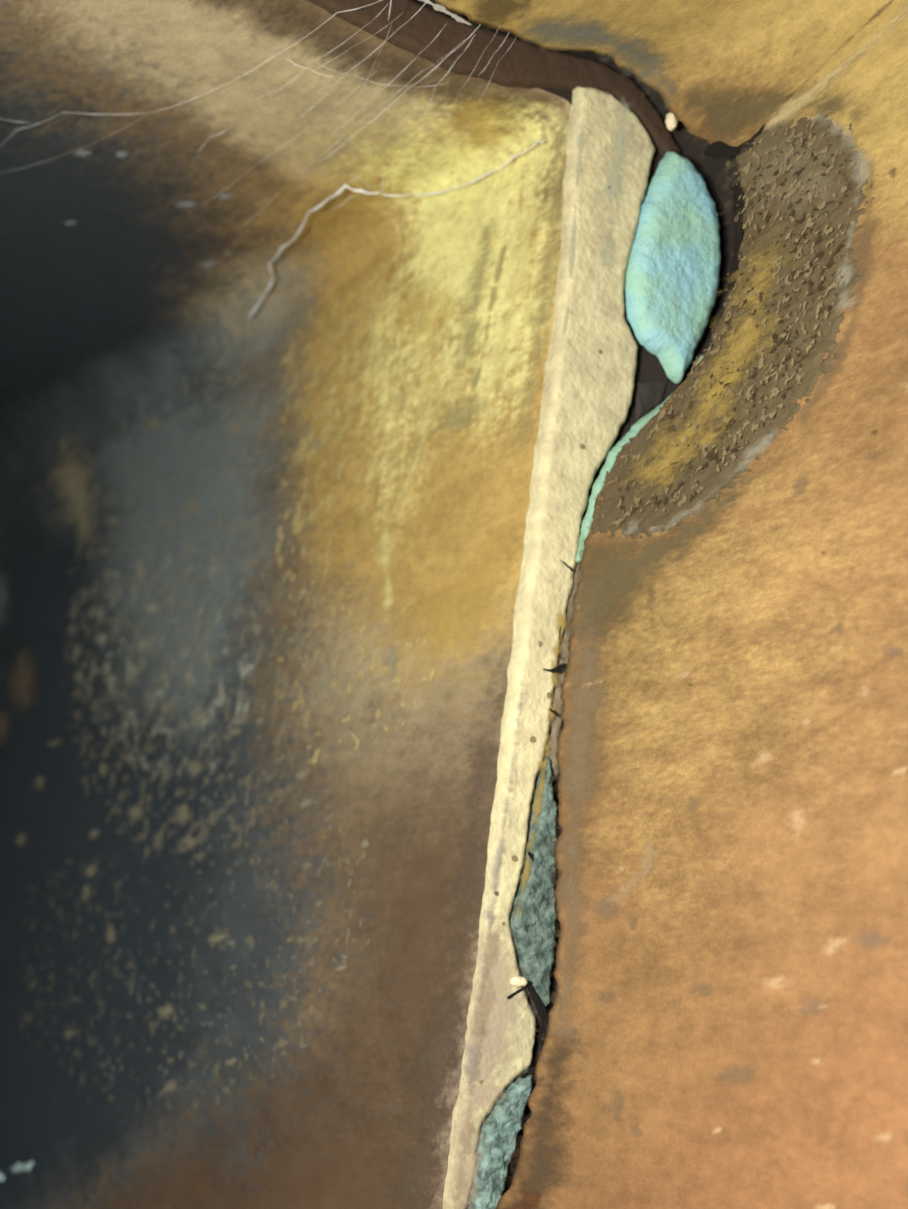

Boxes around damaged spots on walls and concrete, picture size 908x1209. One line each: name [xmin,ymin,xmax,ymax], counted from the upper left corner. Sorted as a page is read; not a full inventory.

spalling [591,112,877,541]
water stain [492,841,503,891]
peeling [511,976,528,988]